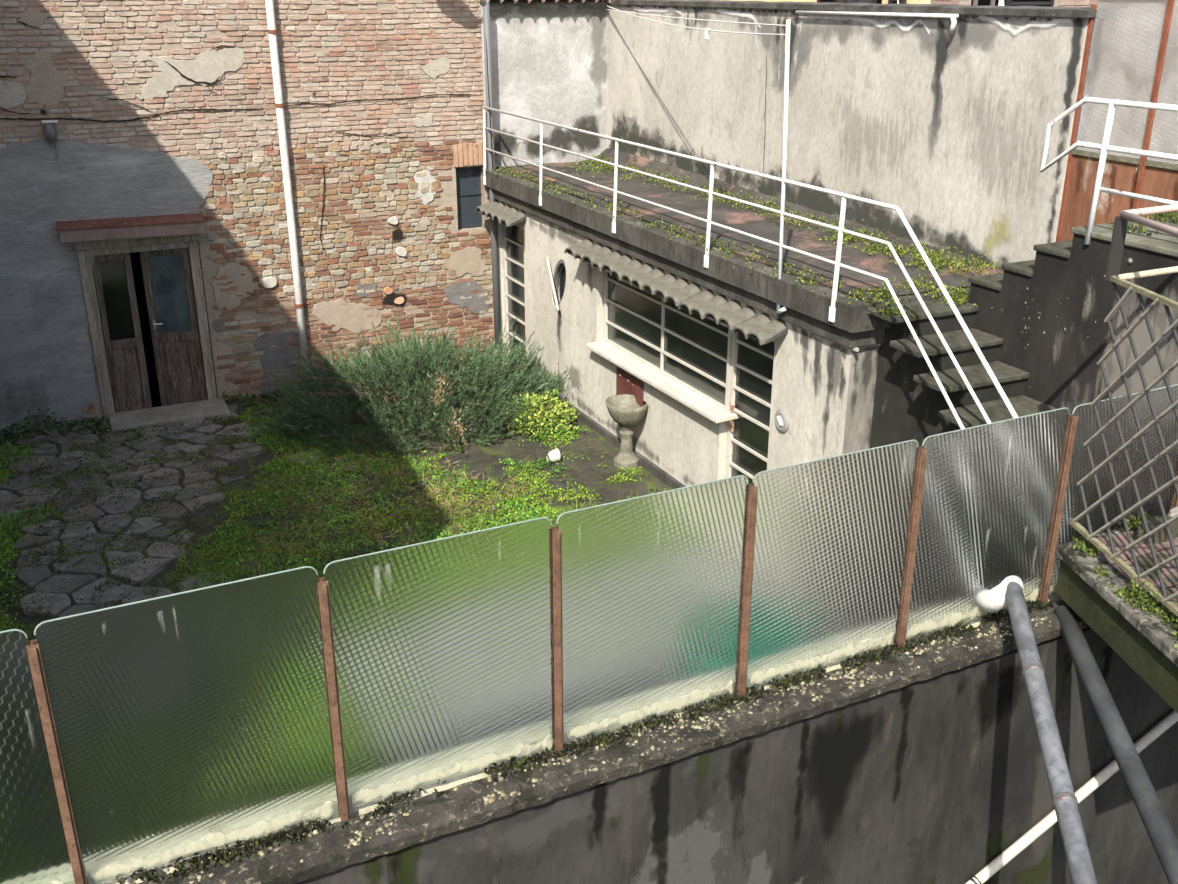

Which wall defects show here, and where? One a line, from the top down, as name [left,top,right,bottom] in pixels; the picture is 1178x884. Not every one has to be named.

crack [0,45,477,122]
crack [337,130,410,138]
water stain [490,5,1083,244]
water stain [494,116,1008,266]
water stain [792,326,879,429]
water stain [330,844,438,884]
water stain [730,745,749,795]
water stain [796,688,913,836]
water stain [988,830,1005,858]
water stain [971,659,1023,761]
water stain [1016,753,1053,884]
water stain [1055,709,1072,749]